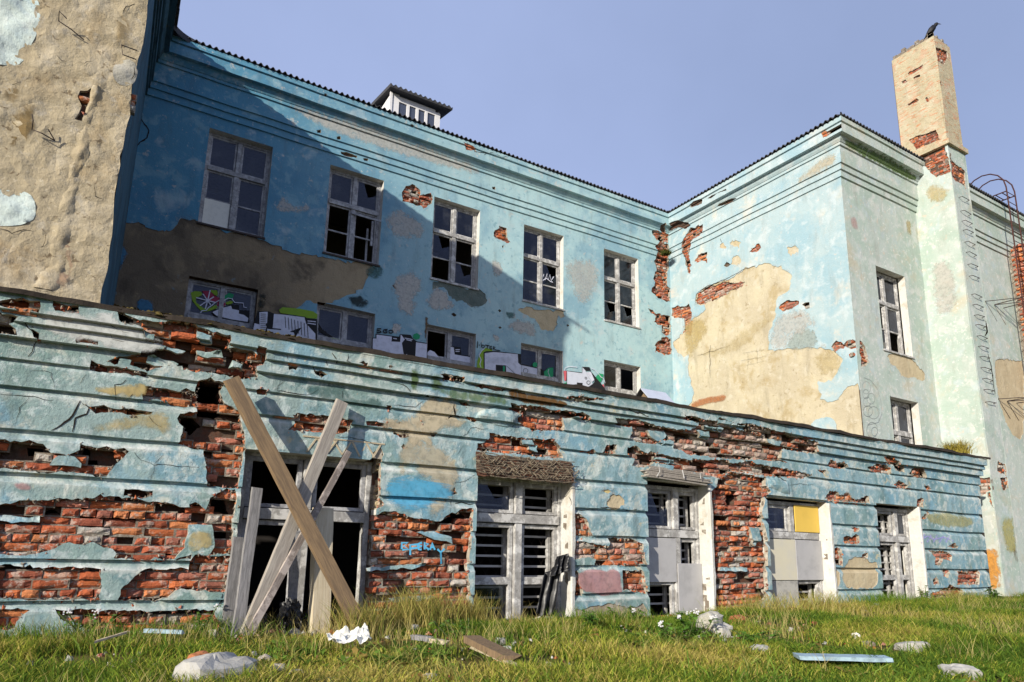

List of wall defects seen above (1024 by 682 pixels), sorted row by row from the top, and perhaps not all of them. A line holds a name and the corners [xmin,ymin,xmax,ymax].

flaking render [0,0,40,66]
flaking render [0,189,36,226]
flaking render [402,185,433,208]
flaking render [909,131,966,189]
crack [3,323,89,432]
flaking render [0,219,373,631]
flaking render [476,394,602,458]
flaking render [580,220,869,611]
flaking render [363,398,478,627]
flaking render [563,514,649,617]